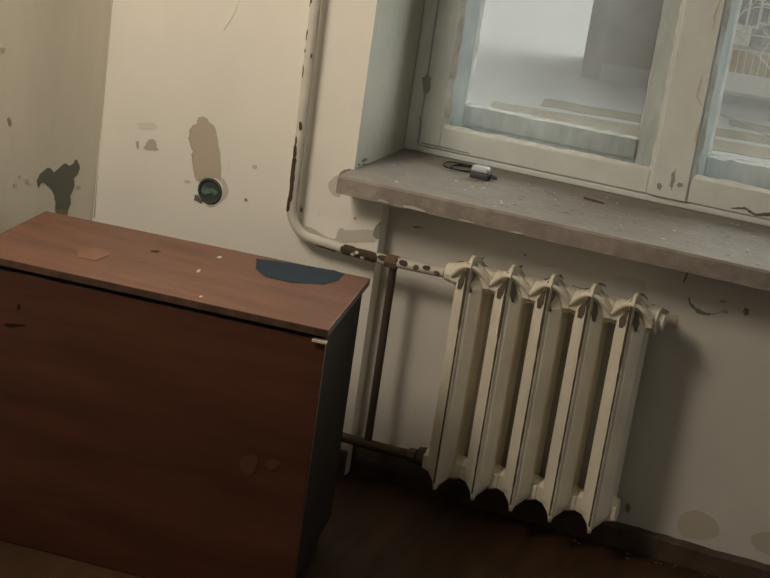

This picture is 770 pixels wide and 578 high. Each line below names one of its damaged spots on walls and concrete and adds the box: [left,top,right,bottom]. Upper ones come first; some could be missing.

peeling [191,117,221,182]
corrosion [286,121,302,212]
flaking render [24,159,80,210]
crack [731,207,770,216]
corrosion [316,244,385,262]
corrosion [396,259,440,276]
crack [688,298,728,315]